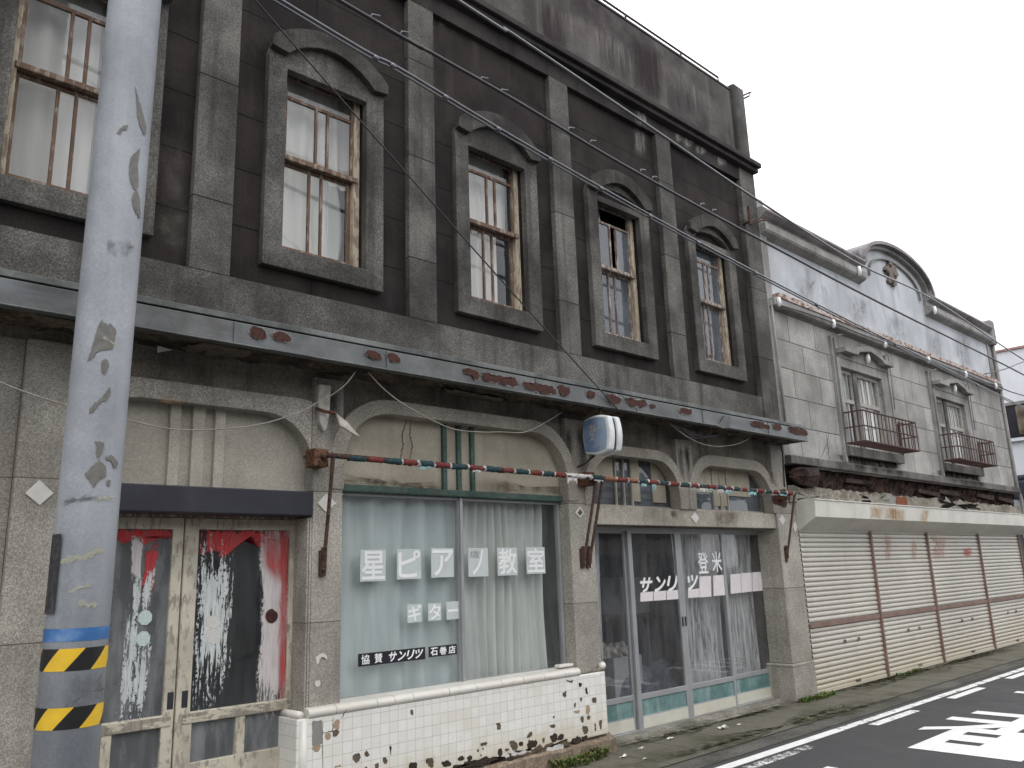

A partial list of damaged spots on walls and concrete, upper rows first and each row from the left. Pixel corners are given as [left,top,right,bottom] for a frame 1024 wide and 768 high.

rust [250,326,291,342]
rust [365,350,401,363]
rust [463,368,570,396]
rust [587,390,656,409]
crack [400,421,413,459]
rust [751,421,808,436]
flaking render [932,497,980,510]
peeling [115,529,172,722]
peeling [192,530,289,715]
spalling [409,680,602,768]
spalling [312,709,347,768]
spalling [353,745,392,768]